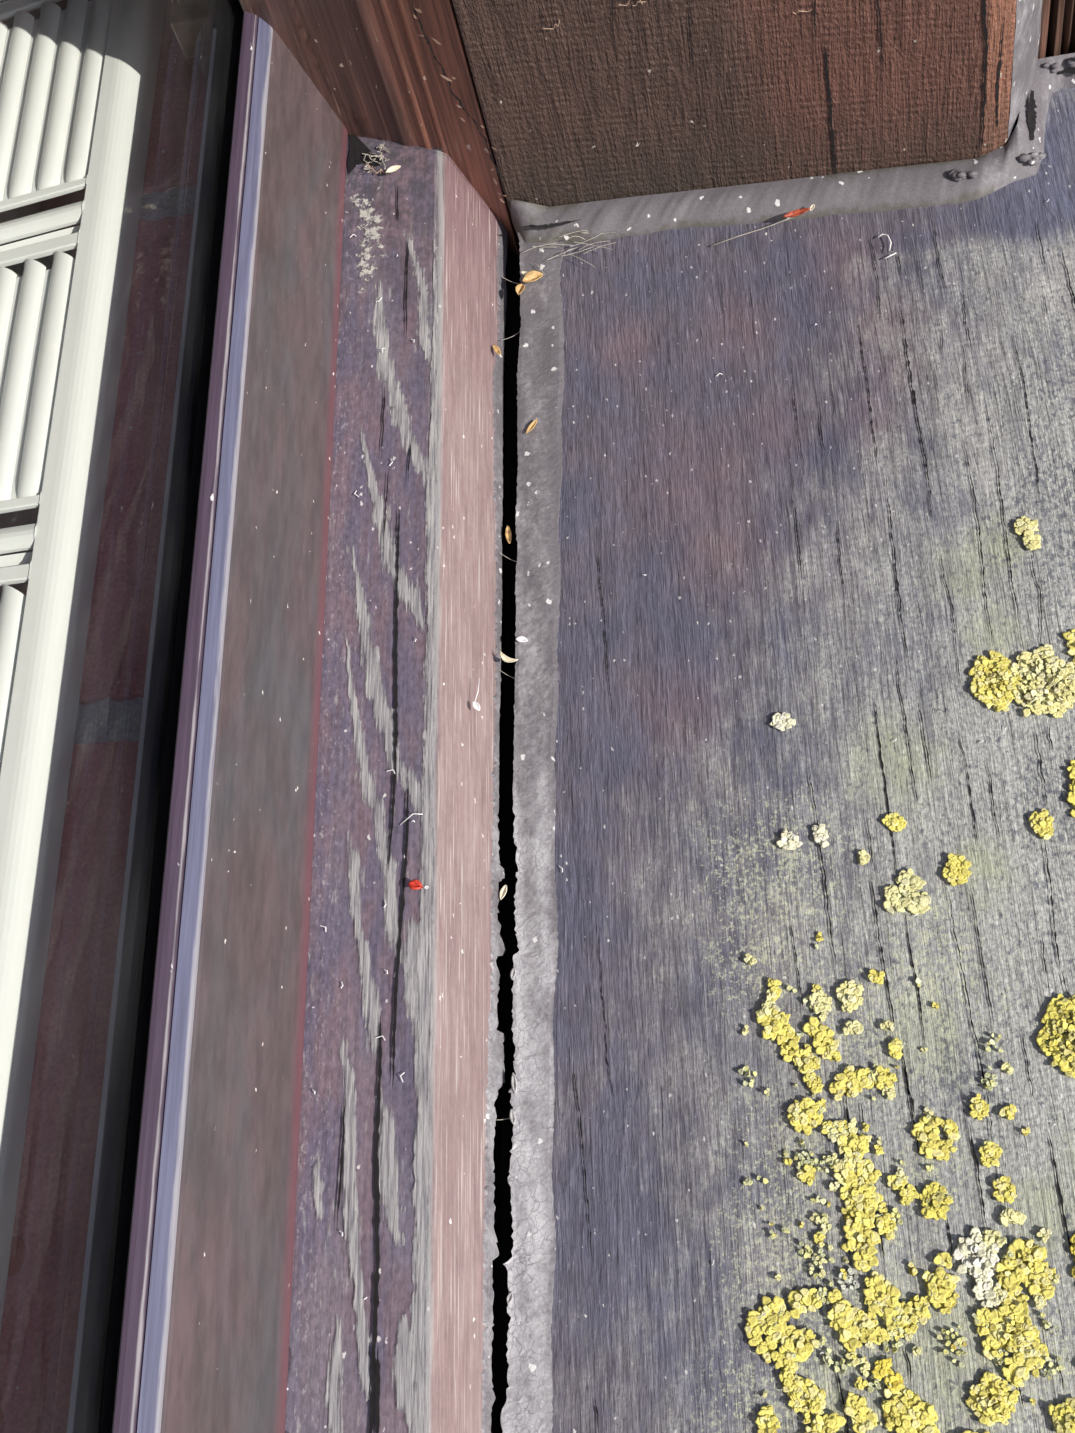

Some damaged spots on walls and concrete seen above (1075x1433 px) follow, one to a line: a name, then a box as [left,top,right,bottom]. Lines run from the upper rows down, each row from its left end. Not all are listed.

crack [337,386,412,1433]
crack [500,252,521,1433]